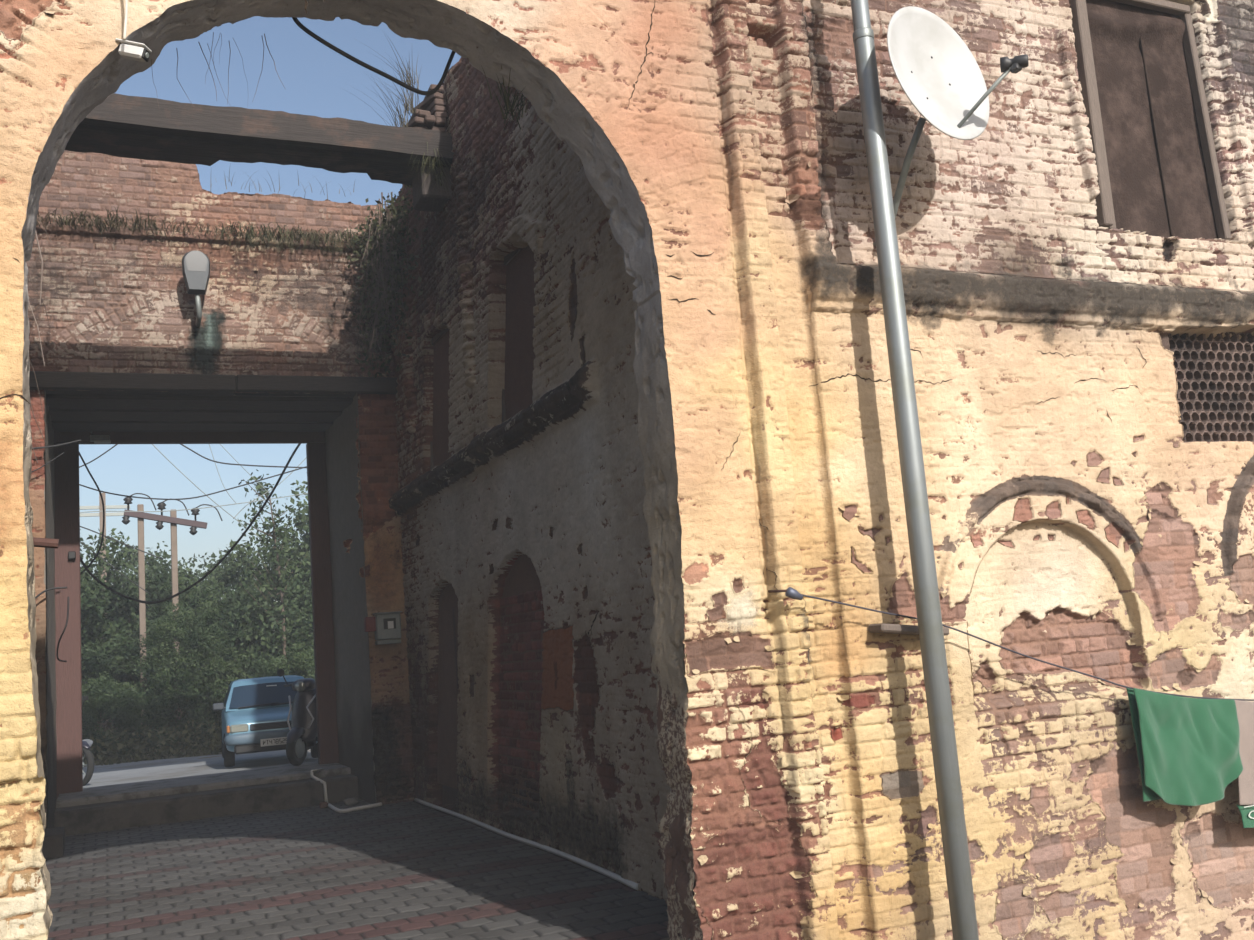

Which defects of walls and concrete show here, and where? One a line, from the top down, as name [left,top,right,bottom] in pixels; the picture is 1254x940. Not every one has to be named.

damp [802,236,882,297]
damp [901,258,1254,335]
peeling [1072,451,1124,486]
peeling [681,561,777,678]
peeling [970,532,1015,548]
spalling [974,604,1224,691]
peeling [1013,481,1203,633]
peeling [1219,552,1254,631]
spalling [831,726,844,742]
spalling [693,688,818,940]
spalling [968,838,986,861]
spalling [993,744,1254,940]